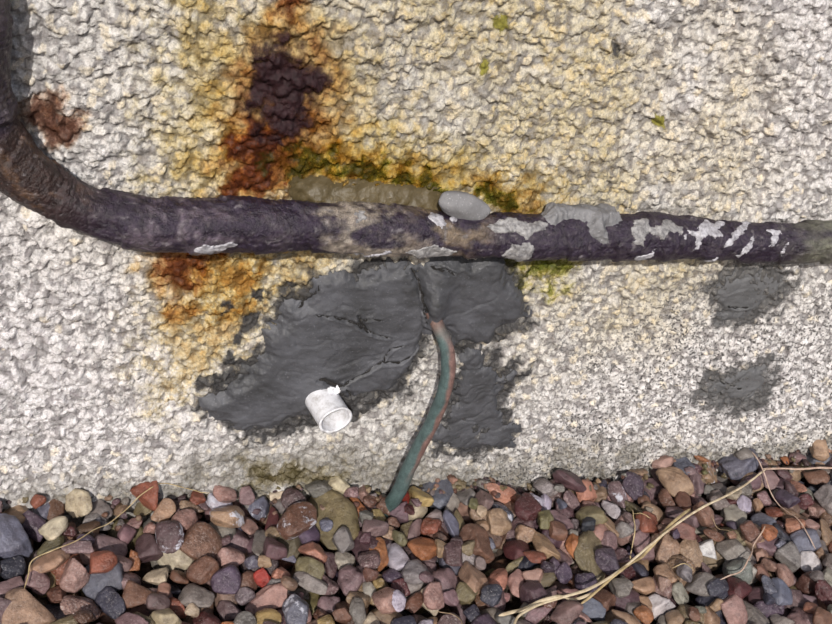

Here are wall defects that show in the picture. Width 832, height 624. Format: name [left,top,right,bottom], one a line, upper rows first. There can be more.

rust [29,94,77,146]
rust [222,31,333,198]
rust [155,252,226,290]
crack [298,285,410,400]